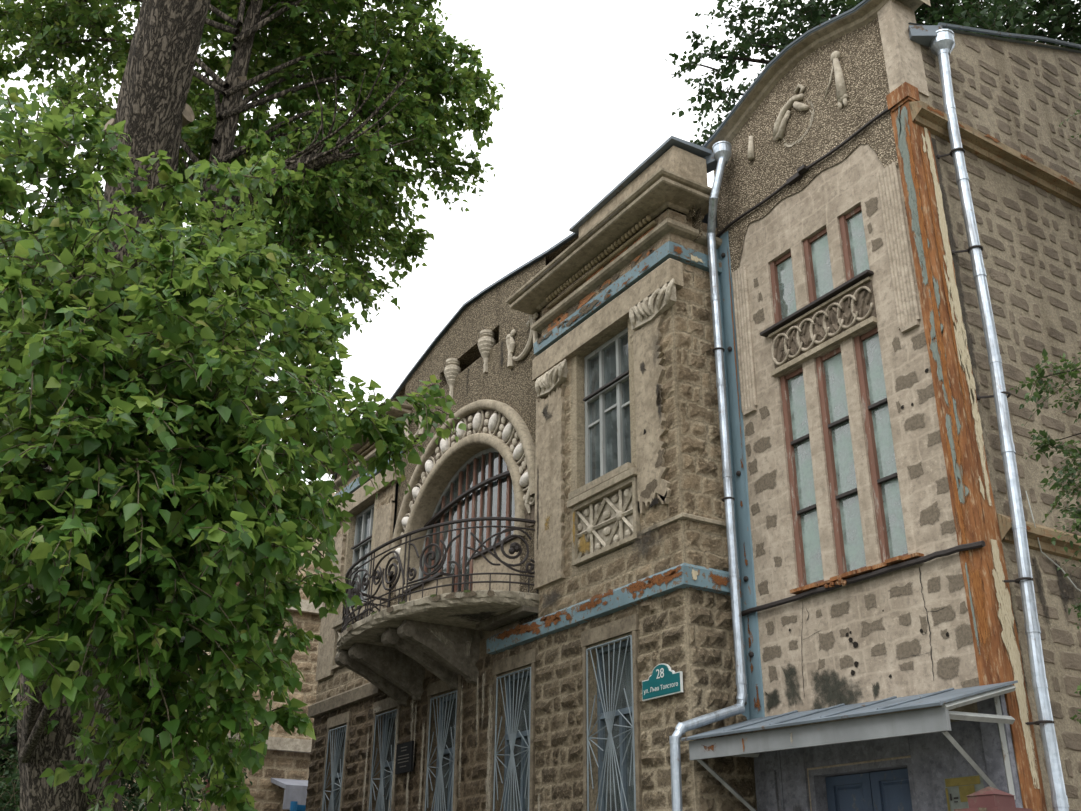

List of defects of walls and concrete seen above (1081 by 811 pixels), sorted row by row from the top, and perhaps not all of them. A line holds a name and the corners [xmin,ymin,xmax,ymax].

spalling [537,227,654,344]
peeling [892,106,992,535]
spalling [430,590,495,601]
mould [766,664,801,711]
mould [812,671,879,710]
crack [911,567,945,681]
peeling [990,539,1040,789]